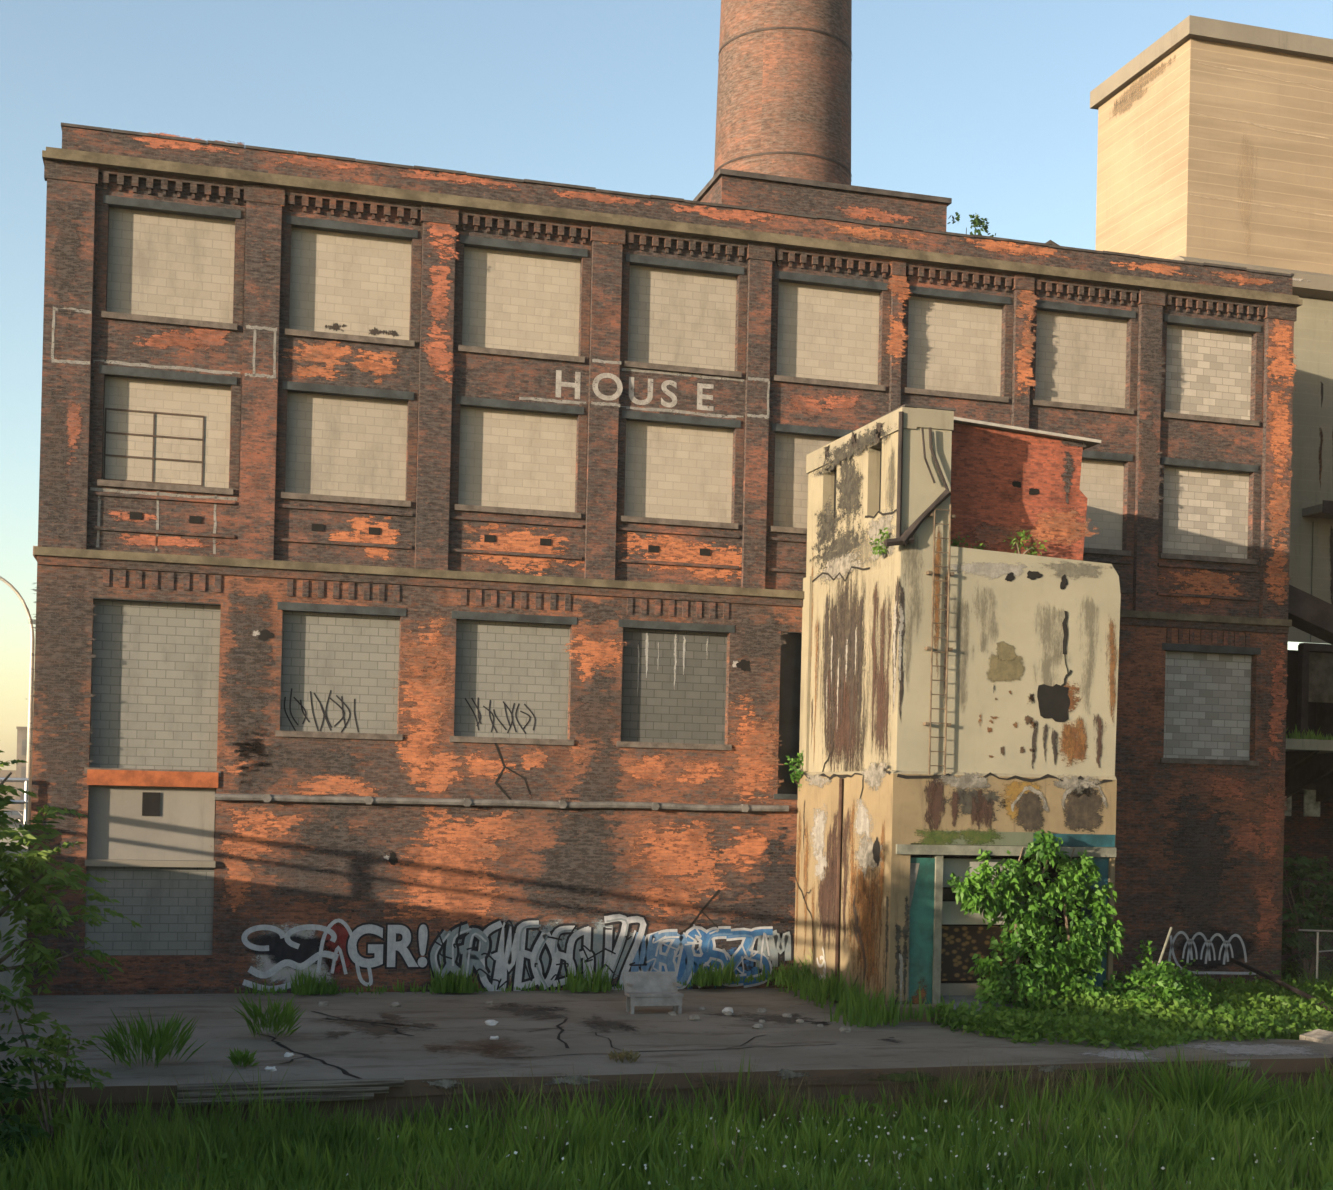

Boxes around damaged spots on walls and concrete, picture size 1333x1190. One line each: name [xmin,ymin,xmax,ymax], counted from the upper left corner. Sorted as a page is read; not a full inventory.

spalling [420,222,459,383]
spalling [281,340,400,383]
damp [574,599,628,626]
damp [735,612,792,671]
damp [810,422,897,772]
spalling [378,618,548,933]
rust [1000,781,1040,822]
spalling [219,774,380,917]
spalling [620,819,778,923]
crack [255,1029,363,1079]
crack [311,1011,430,1036]
crack [508,1014,829,1058]